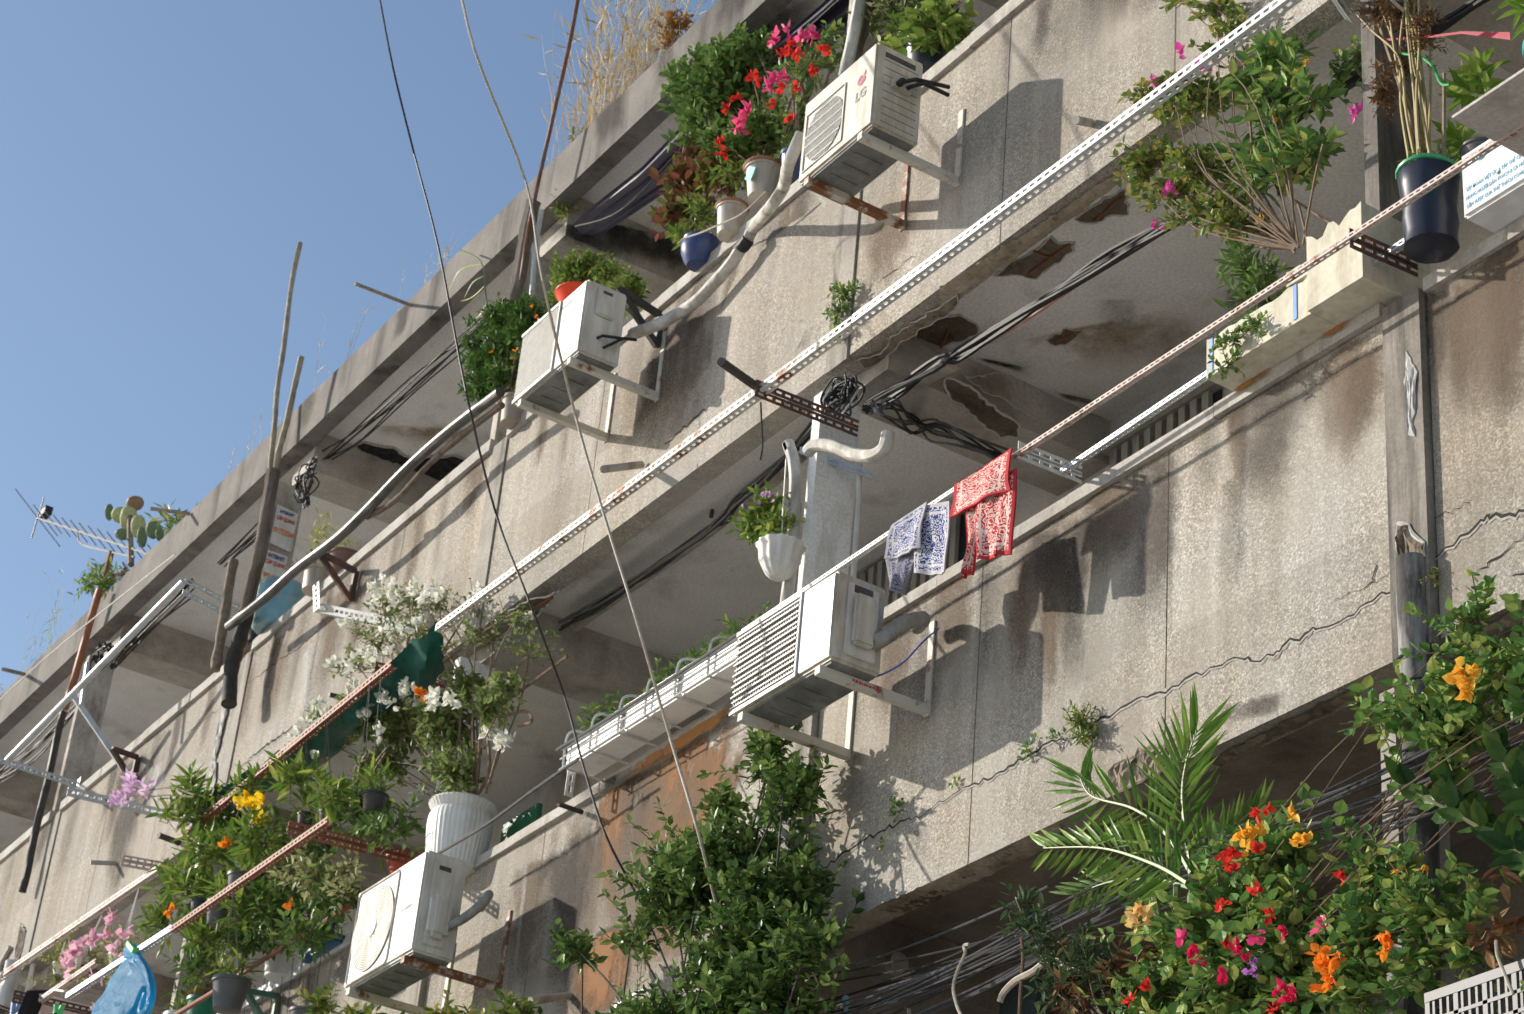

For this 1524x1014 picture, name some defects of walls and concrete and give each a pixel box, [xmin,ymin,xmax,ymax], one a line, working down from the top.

peeling [857,167,1136,370]
water stain [1425,237,1524,388]
water stain [1228,390,1288,481]
water stain [1324,339,1383,444]
water stain [937,578,969,649]
water stain [1009,459,1173,666]
crack [1435,496,1524,576]
crack [819,561,1390,871]
corrosion [569,710,737,1010]